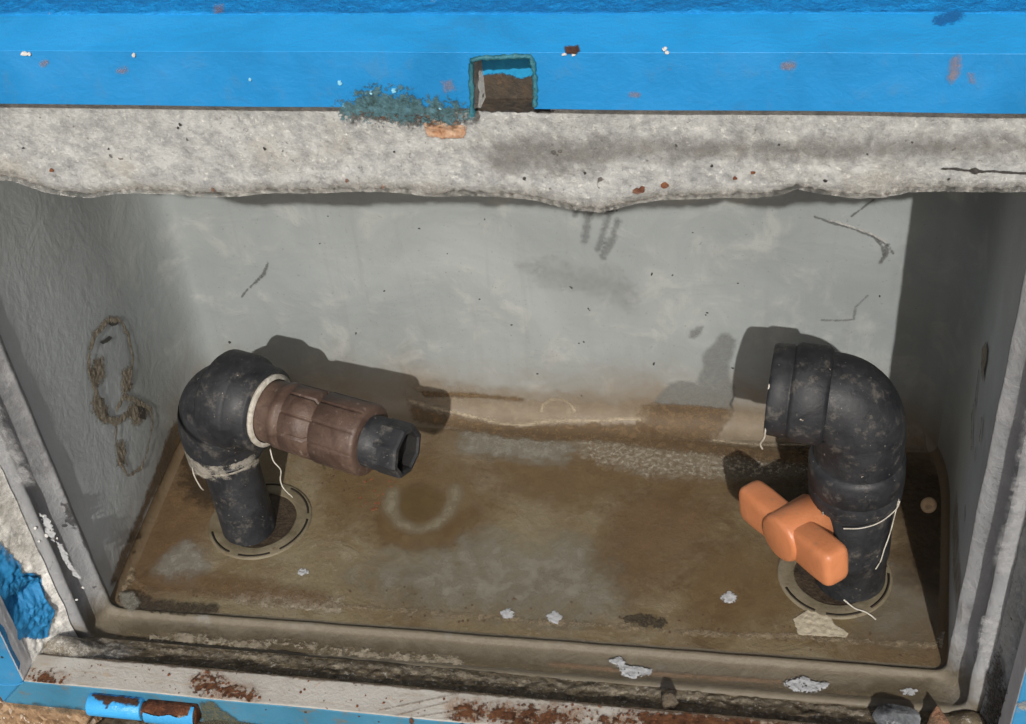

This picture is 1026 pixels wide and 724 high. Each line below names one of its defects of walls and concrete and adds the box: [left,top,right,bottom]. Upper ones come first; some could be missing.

crack [814,199,894,263]
water stain [409,336,811,502]
water stain [111,422,214,583]
water stain [132,486,646,631]
water stain [894,466,941,586]
rust [191,670,270,702]
rust [443,698,781,724]